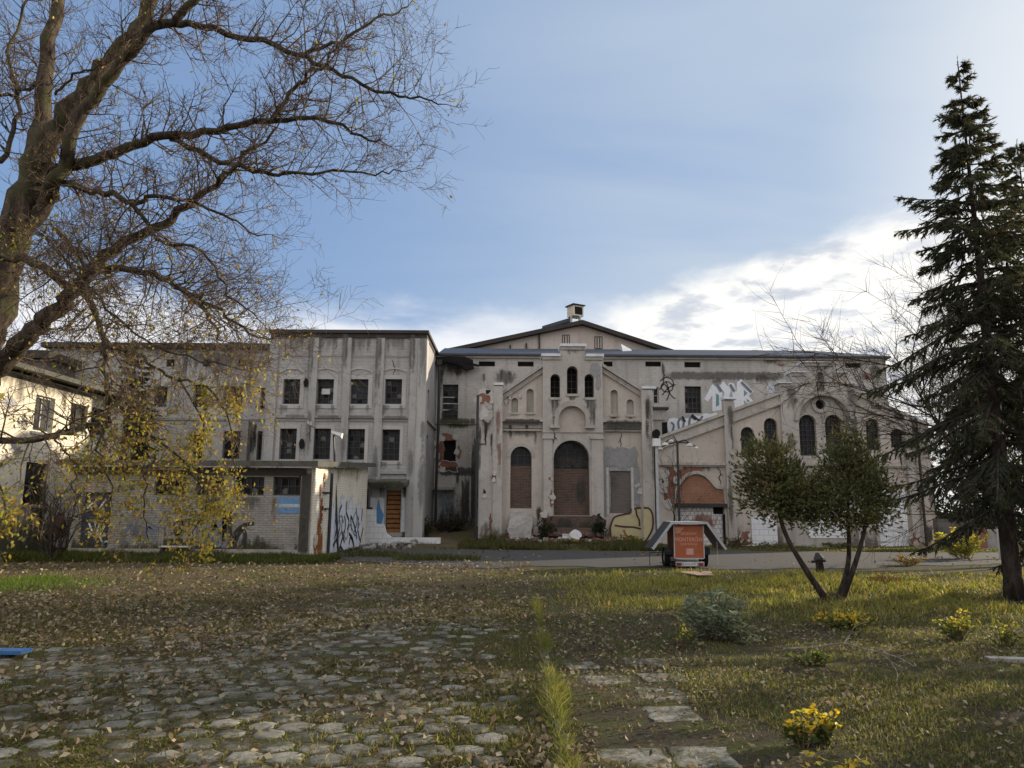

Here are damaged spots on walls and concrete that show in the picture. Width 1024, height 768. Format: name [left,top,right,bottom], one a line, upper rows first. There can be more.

peeling [473,391,494,422]
spalling [434,433,462,472]
spalling [659,461,725,510]
corrosion [316,473,326,554]